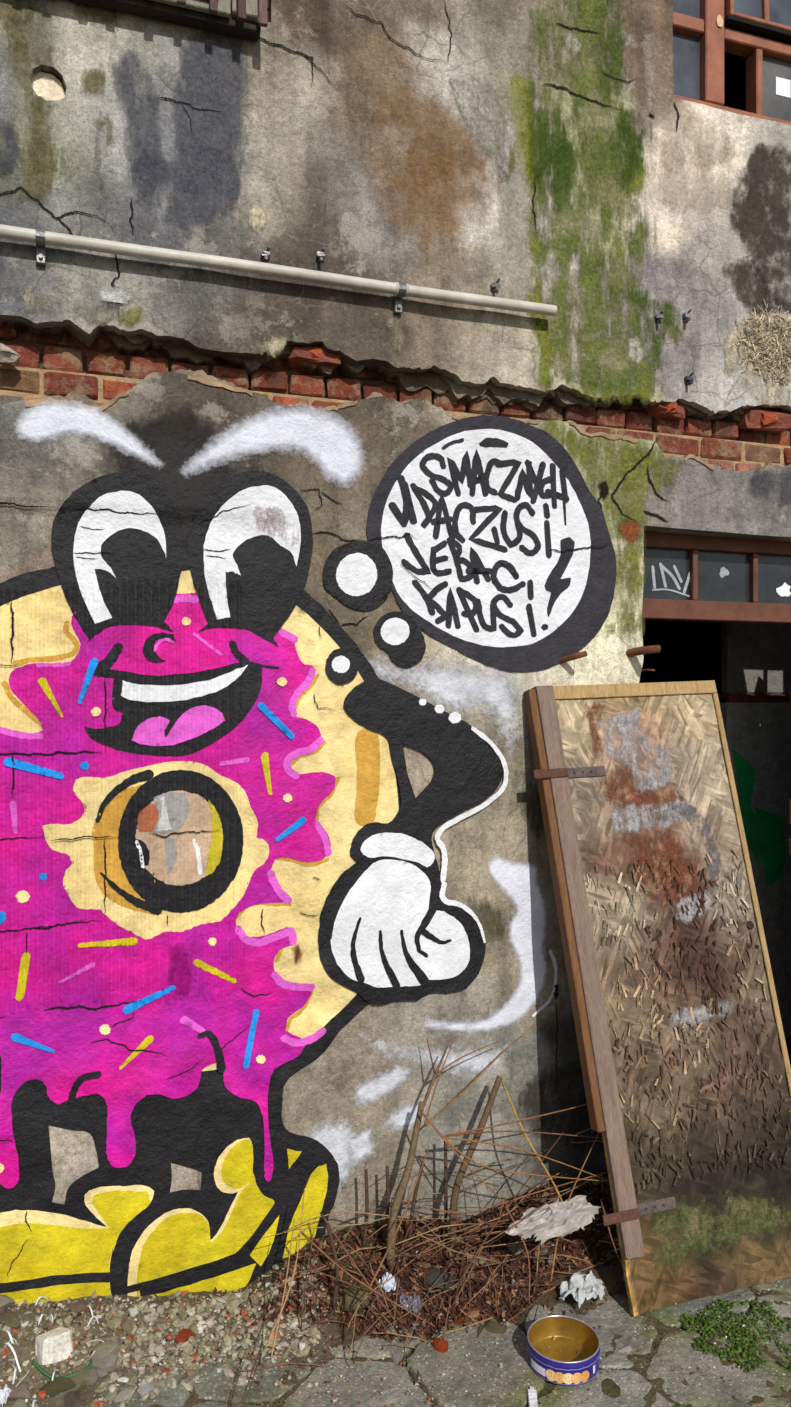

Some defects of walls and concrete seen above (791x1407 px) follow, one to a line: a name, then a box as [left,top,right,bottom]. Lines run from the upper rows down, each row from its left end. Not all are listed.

leakage [76,3,118,23]
leakage [0,0,56,201]
leakage [84,31,247,228]
crack [0,186,135,291]
leakage [728,143,791,314]
spalling [98,286,130,309]
flaking render [0,299,791,471]
crack [0,502,154,559]
crack [199,506,244,559]
spalling [599,482,609,499]
crack [1,601,27,667]
crack [0,680,107,796]